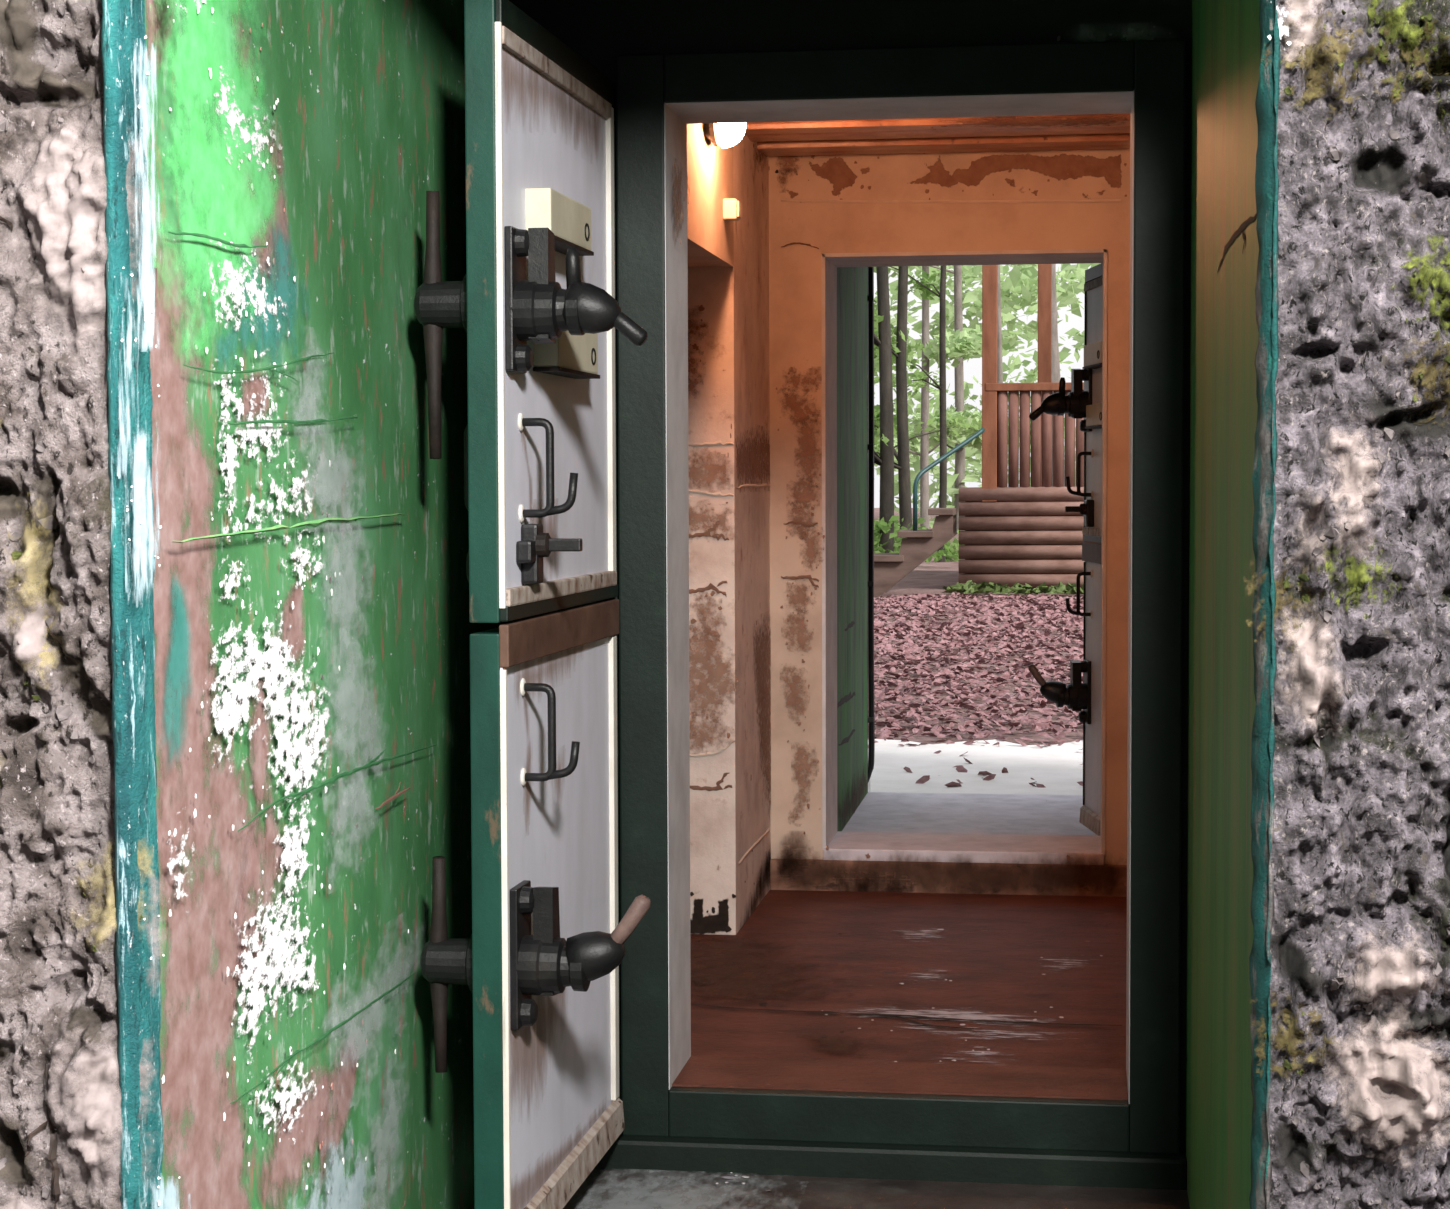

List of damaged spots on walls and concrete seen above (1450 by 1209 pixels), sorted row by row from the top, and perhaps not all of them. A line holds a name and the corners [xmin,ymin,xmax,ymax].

peeling [788,155,880,200]
peeling [910,153,1127,200]
peeling [117,0,379,1209]
damp [746,729,1127,921]
damp [690,937,826,1005]